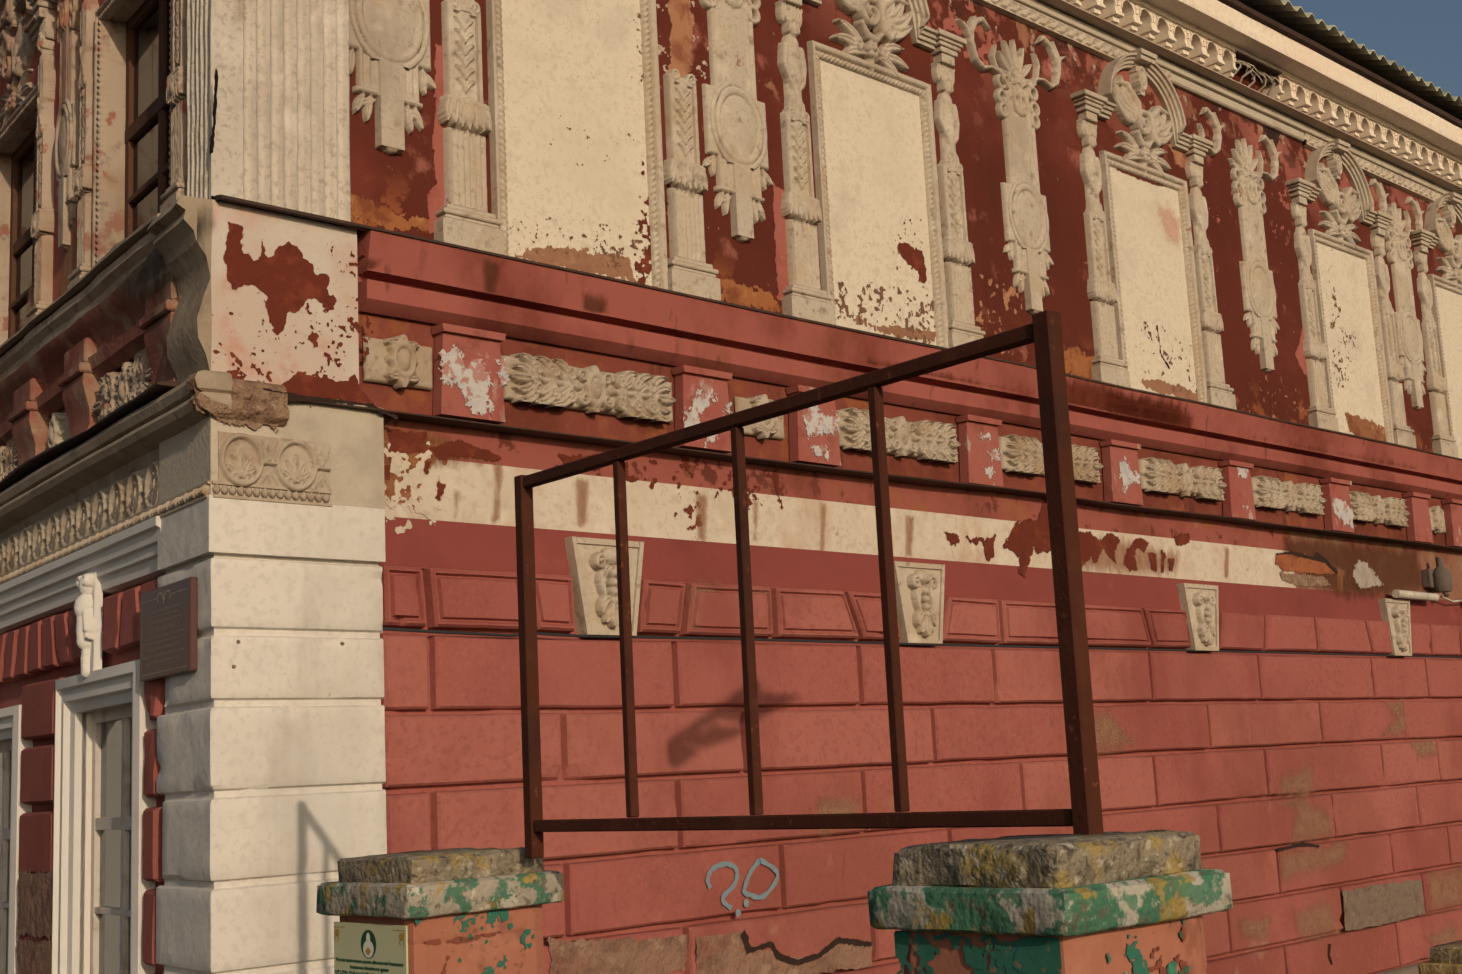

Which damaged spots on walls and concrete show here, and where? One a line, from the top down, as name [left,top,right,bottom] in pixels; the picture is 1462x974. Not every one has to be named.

peeling [213,221,376,408]
peeling [438,344,510,416]
peeling [384,426,502,534]
peeling [945,499,1051,578]
peeling [1079,531,1190,573]
spalling [1275,553,1335,589]
spalling [1353,560,1384,589]
spalling [448,908,872,974]
crack [741,930,872,966]
peeling [894,930,1062,974]
peeling [1107,919,1190,974]